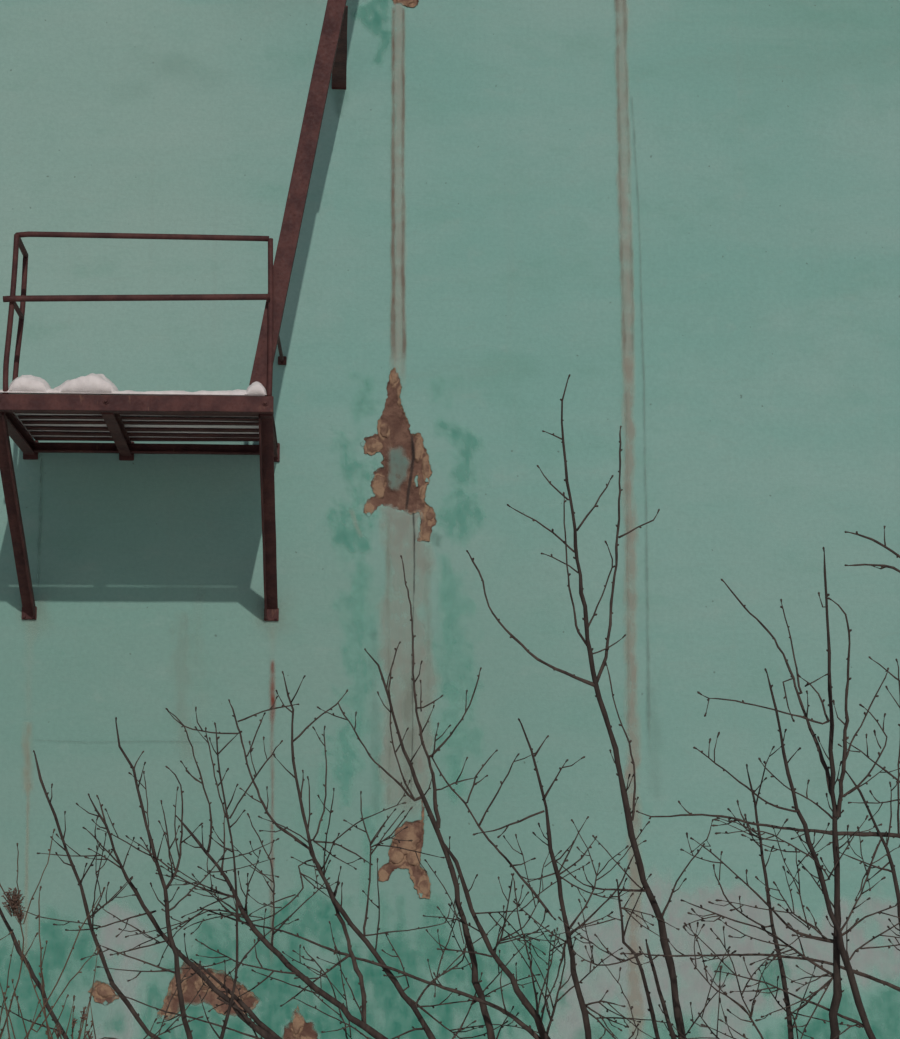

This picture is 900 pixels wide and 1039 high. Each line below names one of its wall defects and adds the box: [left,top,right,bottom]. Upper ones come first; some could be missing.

peeling [354,0,419,63]
corrosion [391,4,406,361]
corrosion [616,0,638,578]
flaking render [328,367,483,552]
leakage [353,506,469,803]
corrosion [626,591,648,826]
flaking render [88,981,119,1005]
flaking render [157,962,260,1020]
flaking render [281,1006,318,1039]
flaking render [378,800,431,899]
leakage [0,883,900,1039]
corrosion [628,847,643,1036]